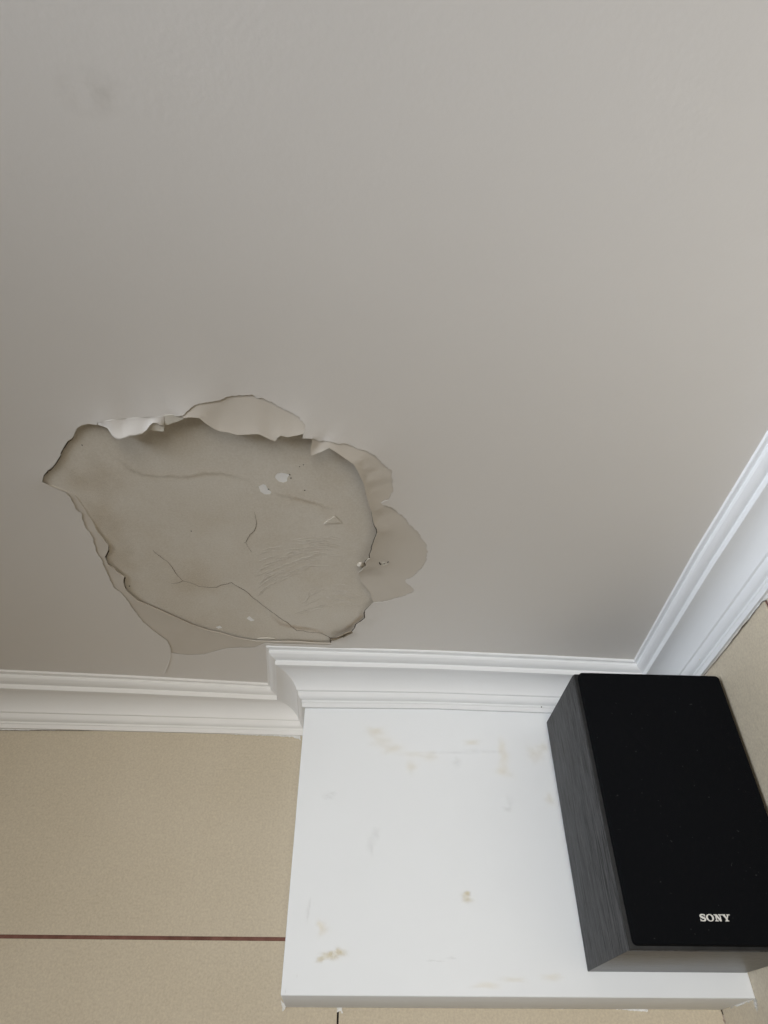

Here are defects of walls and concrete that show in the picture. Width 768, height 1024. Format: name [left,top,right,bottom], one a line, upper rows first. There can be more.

peeling [43,395,428,655]